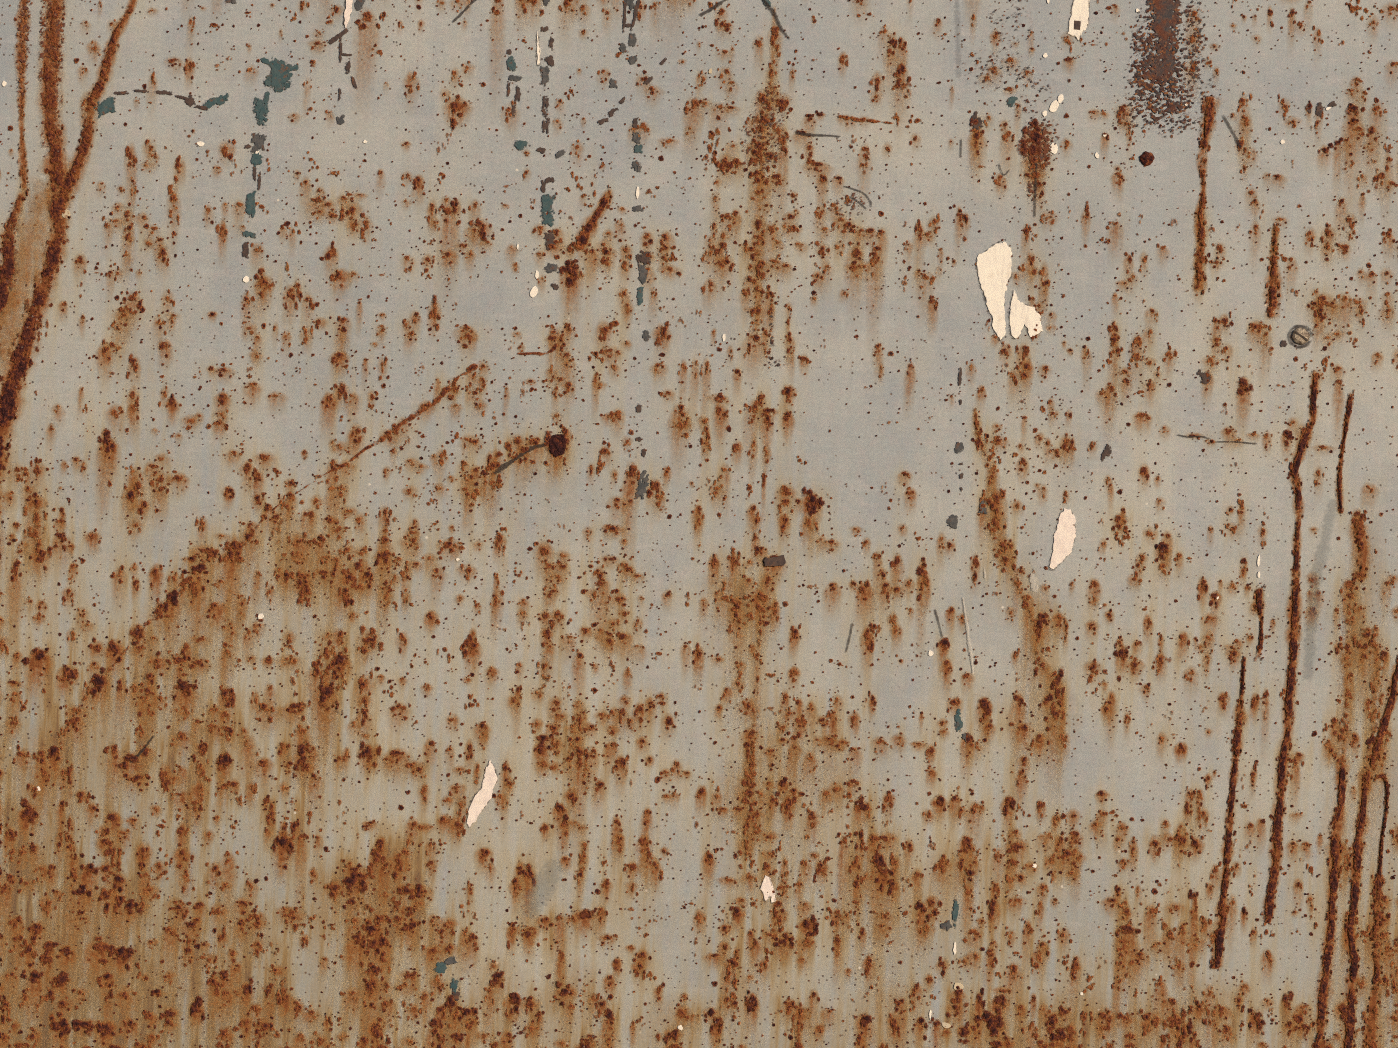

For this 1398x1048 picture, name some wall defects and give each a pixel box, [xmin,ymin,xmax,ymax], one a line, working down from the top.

corrosion [167,0,267,178]
peeling [328,0,365,125]
peeling [1067,0,1090,41]
corrosion [1047,0,1120,75]
corrosion [193,196,269,245]
corrosion [624,0,976,387]
peeling [976,241,1043,341]
corrosion [859,343,935,438]
peeling [1049,508,1076,571]
corrosion [1202,458,1279,549]
corrosion [911,621,997,685]
peeling [466,760,498,827]